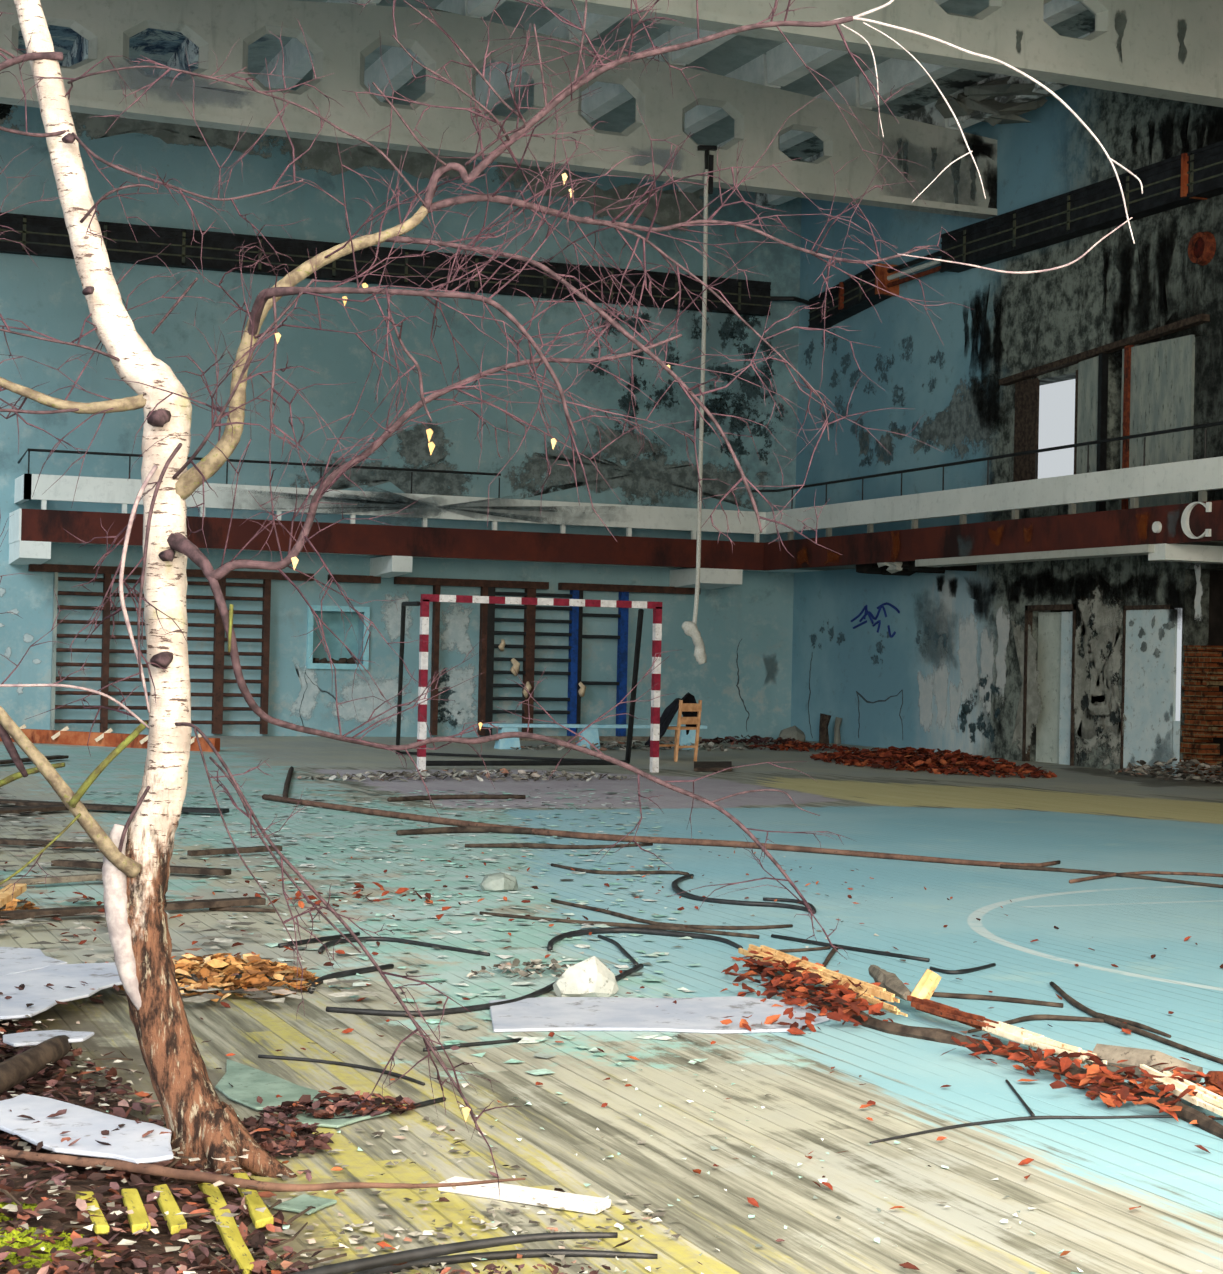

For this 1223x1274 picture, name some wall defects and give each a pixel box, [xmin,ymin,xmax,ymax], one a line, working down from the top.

spalling [935,76,1055,126]
water stain [1131,113,1222,161]
water stain [1103,223,1197,370]
water stain [963,292,1015,430]
peeling [291,420,478,497]
peeling [499,424,767,510]
spalling [859,374,994,465]
water stain [811,622,845,650]
spalling [1011,620,1042,754]
water stain [916,569,1197,764]